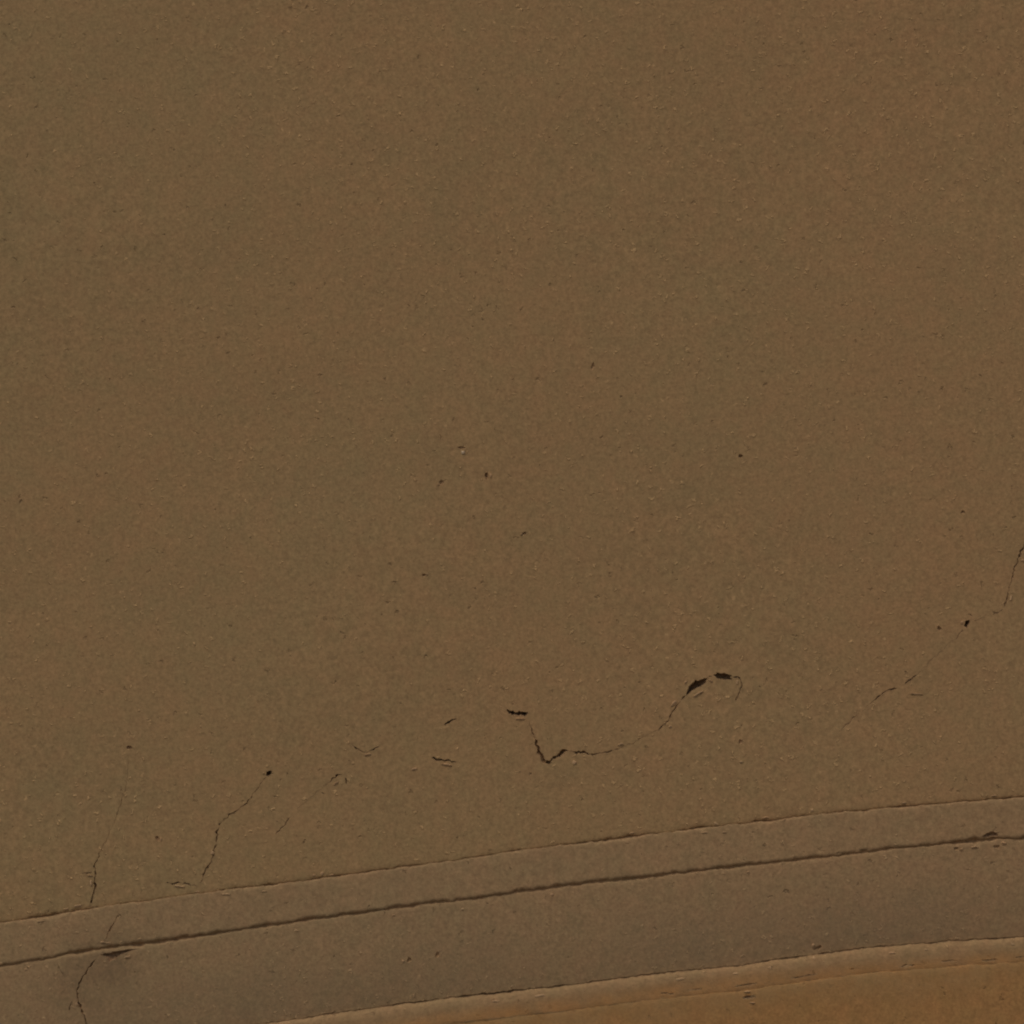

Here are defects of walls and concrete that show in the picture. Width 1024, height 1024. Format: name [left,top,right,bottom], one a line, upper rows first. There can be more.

crack [506,672,743,765]
crack [842,547,1024,729]
crack [0,762,1024,1024]